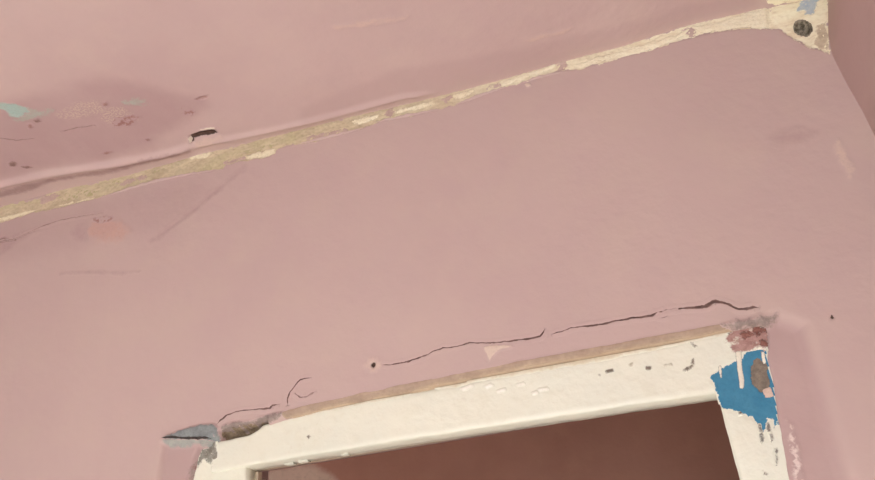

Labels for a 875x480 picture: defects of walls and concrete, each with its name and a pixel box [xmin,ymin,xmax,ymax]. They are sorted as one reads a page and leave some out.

peeling [0,0,833,225]
crack [381,295,759,370]
flaking render [220,410,285,441]
crack [215,374,318,426]
peeling [710,350,780,466]